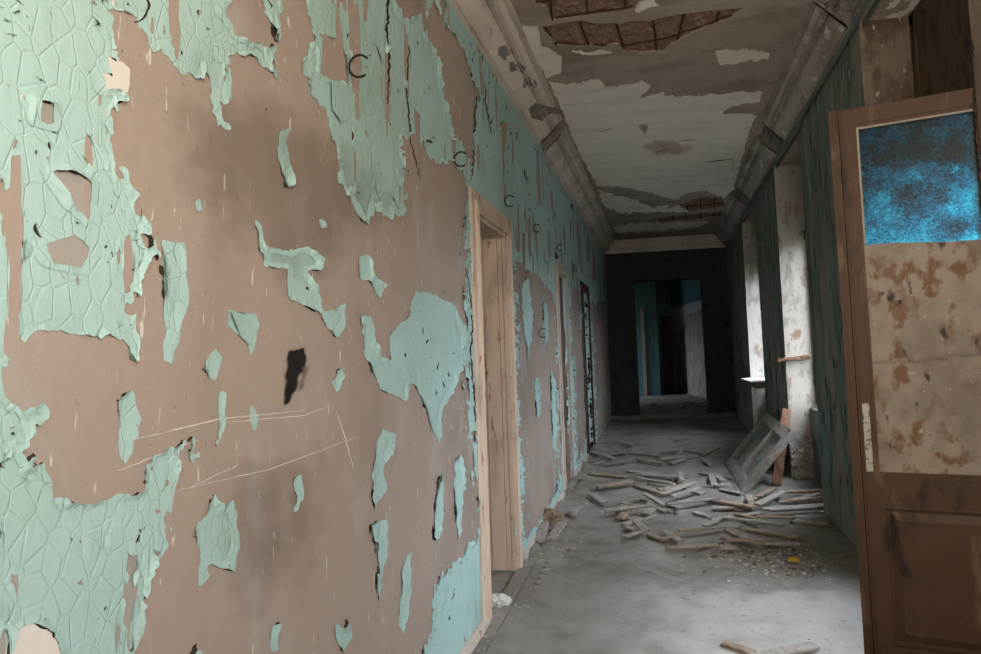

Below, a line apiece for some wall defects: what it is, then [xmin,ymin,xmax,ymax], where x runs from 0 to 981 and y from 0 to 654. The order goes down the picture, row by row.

peeling [522,0,770,234]
peeling [875,0,920,19]
peeling [0,0,611,654]